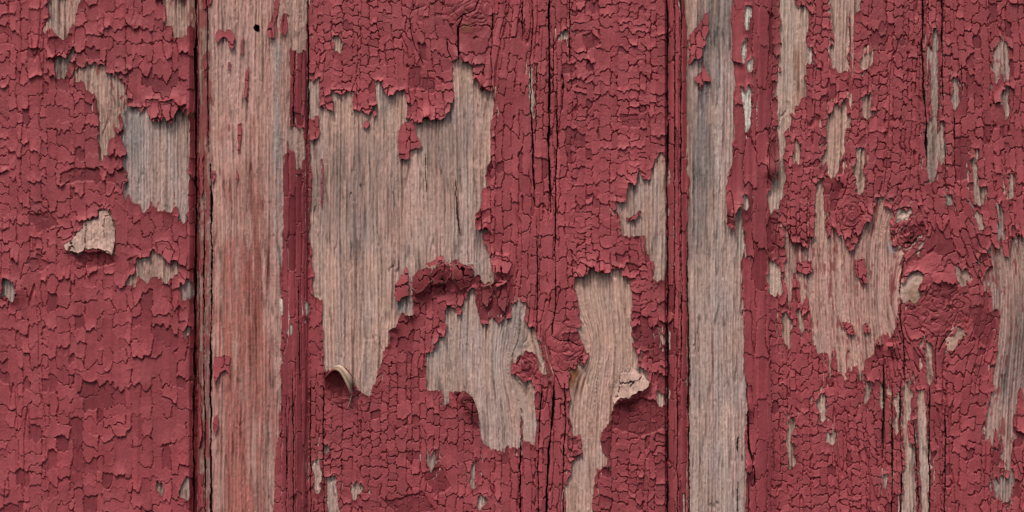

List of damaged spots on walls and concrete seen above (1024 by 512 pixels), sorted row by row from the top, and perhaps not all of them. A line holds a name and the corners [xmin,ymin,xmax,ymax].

crack [192,0,213,512]
crack [292,0,310,133]
crack [285,282,325,512]
peeling [43,0,757,512]
crack [453,179,461,233]
crack [446,0,494,88]
crack [516,0,583,512]
crack [666,0,690,512]
crack [736,385,755,512]
peeling [767,0,1024,512]
crack [881,232,967,512]
crack [921,0,963,192]